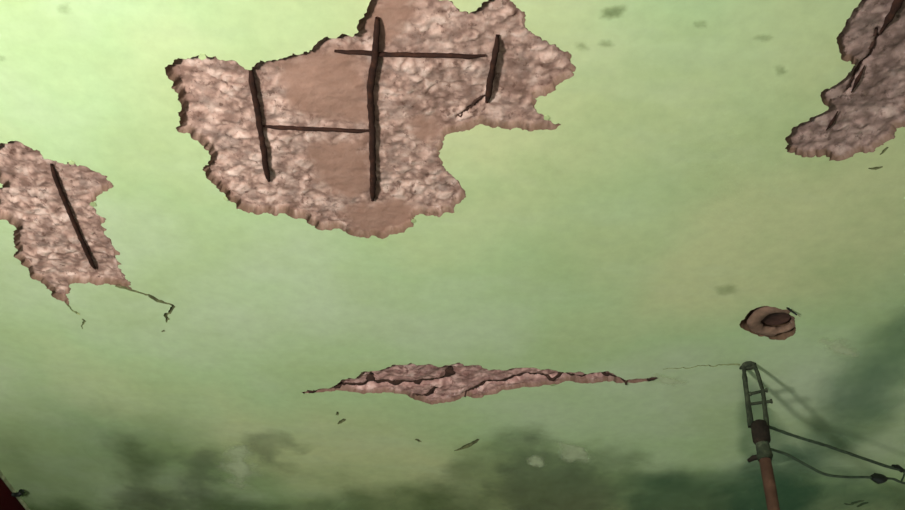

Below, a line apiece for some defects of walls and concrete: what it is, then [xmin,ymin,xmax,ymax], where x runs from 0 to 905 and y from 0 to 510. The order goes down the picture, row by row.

spalling [165,0,576,239]
spalling [785,0,905,161]
spalling [0,141,132,305]
crack [115,284,175,332]
spalling [302,363,657,405]
crack [666,362,740,370]